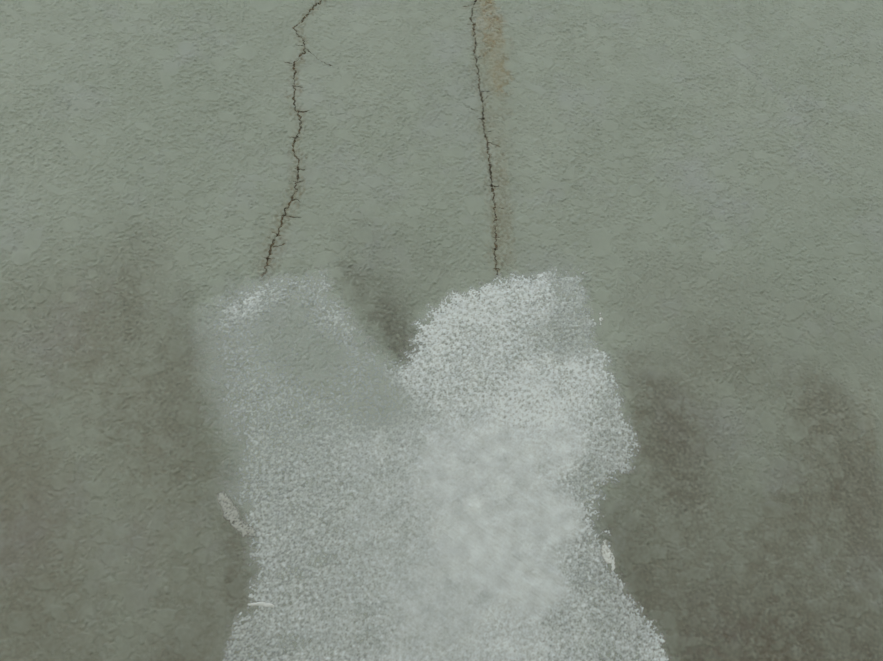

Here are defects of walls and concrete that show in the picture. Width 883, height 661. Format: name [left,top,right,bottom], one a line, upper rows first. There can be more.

crack [261,0,332,278]
crack [463,0,503,275]